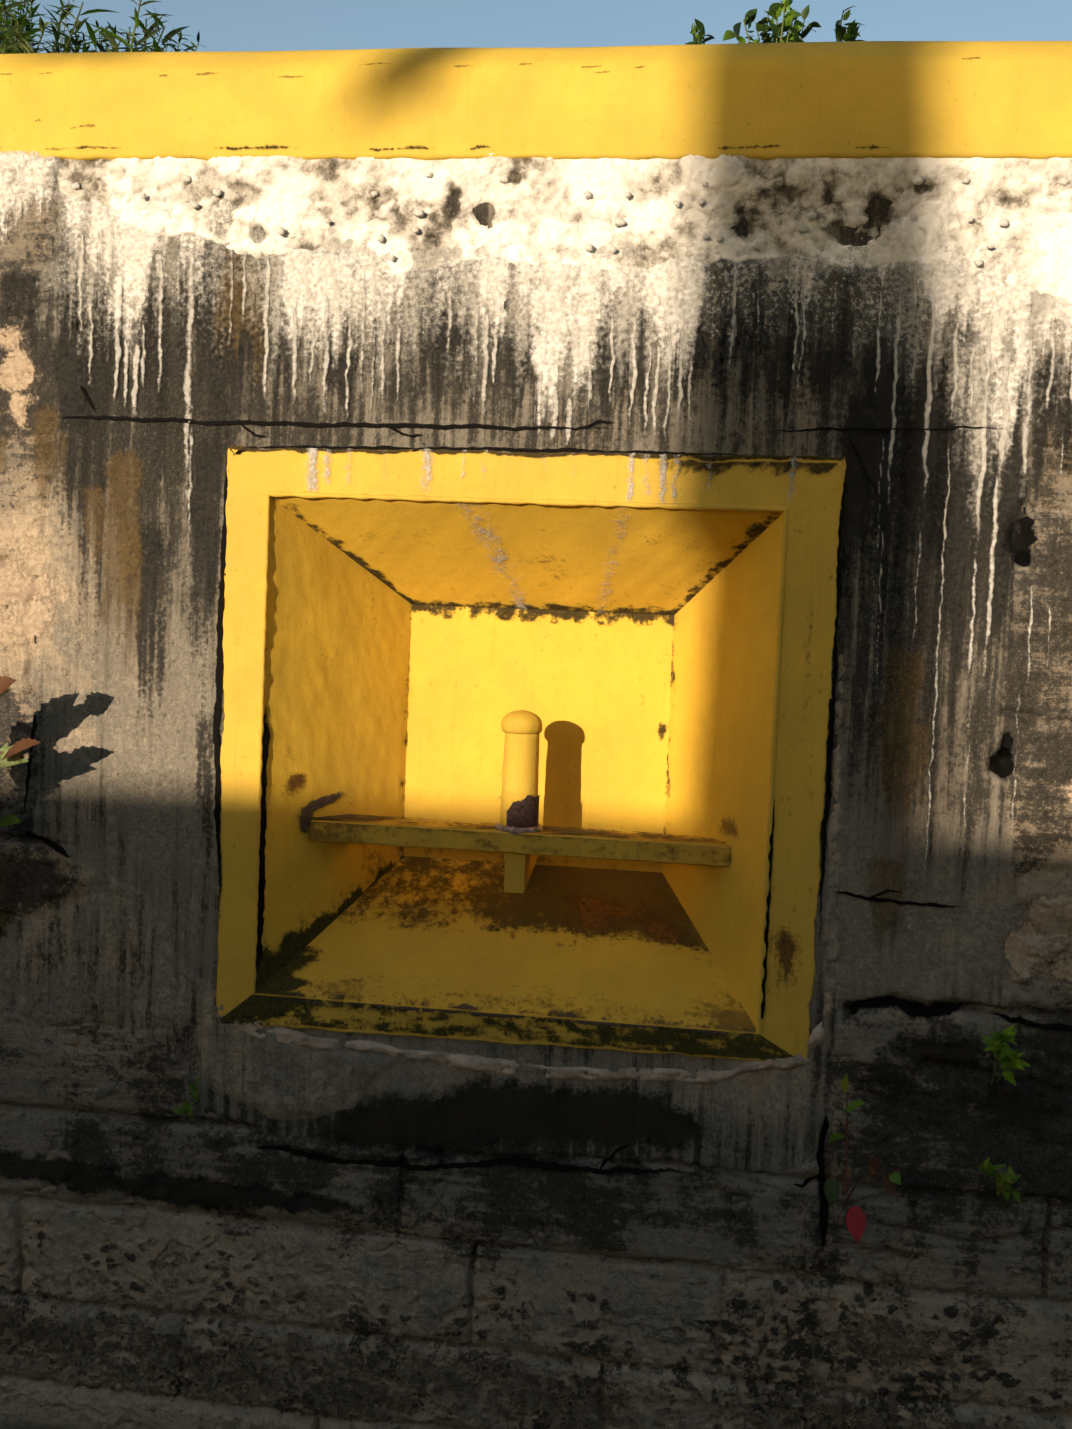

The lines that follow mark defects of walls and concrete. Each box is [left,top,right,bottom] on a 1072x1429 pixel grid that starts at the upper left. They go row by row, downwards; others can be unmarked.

rust [506,795,540,828]
water stain [0,148,1072,870]
rust [771,930,797,981]
crack [778,426,1003,940]